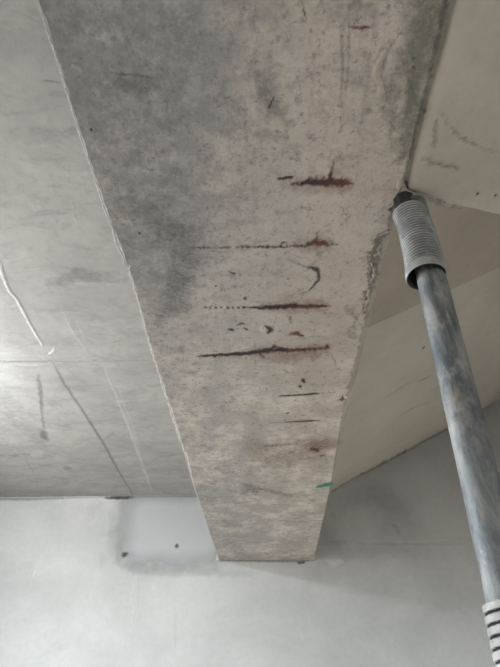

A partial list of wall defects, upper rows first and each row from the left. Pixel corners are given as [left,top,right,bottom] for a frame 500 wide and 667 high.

rust [277,163,352,187]
rust [241,236,337,249]
rust [196,345,330,358]